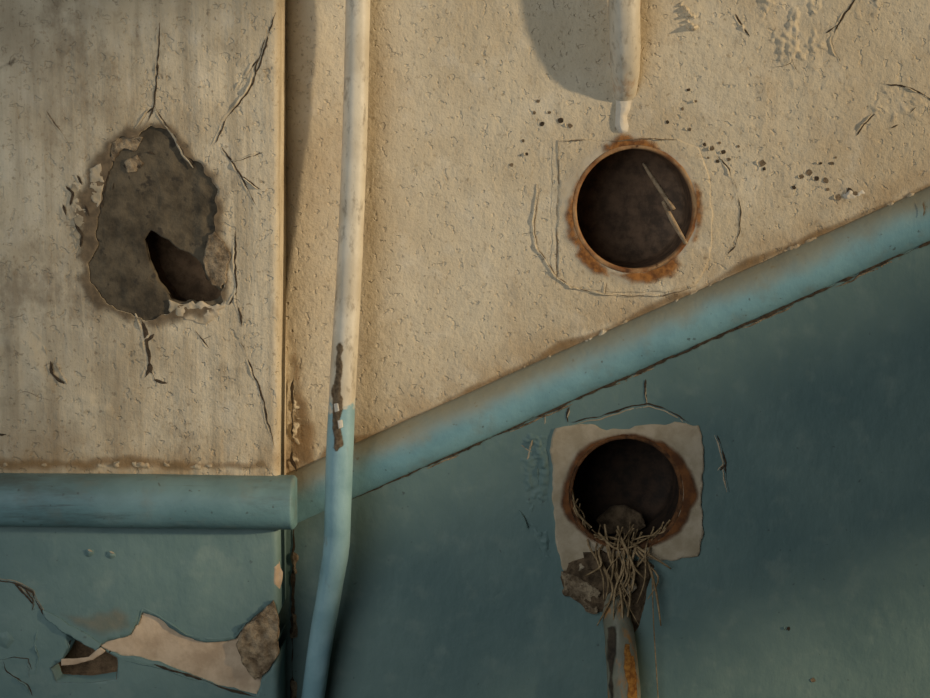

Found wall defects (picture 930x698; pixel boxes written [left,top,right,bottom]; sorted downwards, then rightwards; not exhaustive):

crack [134,25,194,168]
crack [211,12,276,205]
corrosion [605,135,659,151]
flaking render [62,124,231,325]
corrosion [566,183,607,274]
corrosion [625,257,678,283]
corrosion [561,434,698,546]
peeling [274,562,283,589]
peeling [42,600,280,698]
corrosion [624,644,637,698]